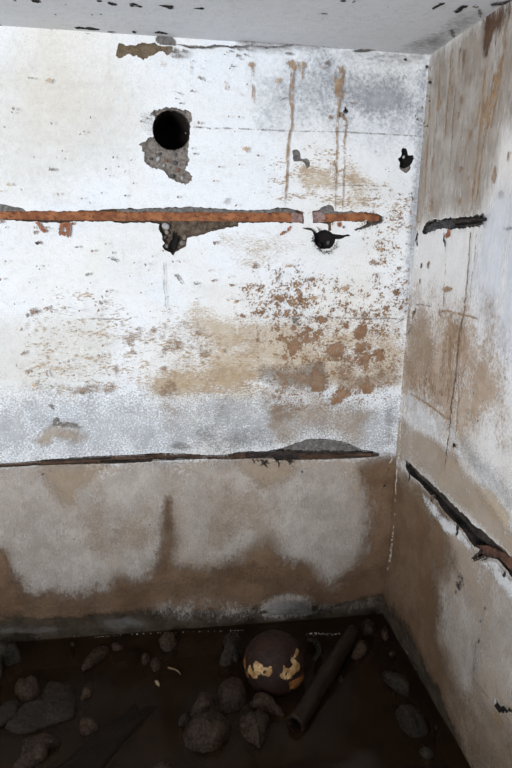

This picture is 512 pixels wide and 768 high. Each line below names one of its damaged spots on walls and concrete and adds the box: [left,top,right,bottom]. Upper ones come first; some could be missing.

peeling [116,31,188,60]
spalling [139,90,209,185]
rust [276,60,306,200]
rust [328,66,354,210]
hole [398,149,412,173]
peeling [0,185,512,598]
crack [311,232,477,469]
leakage [0,299,512,768]